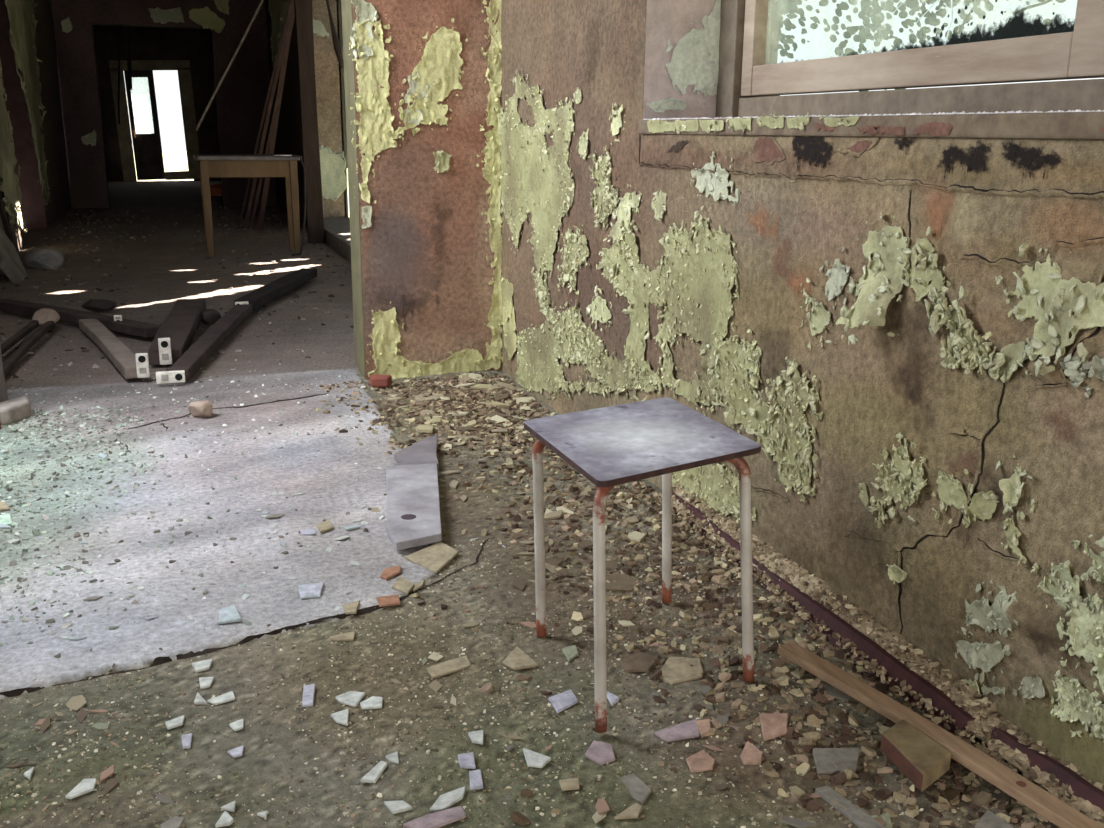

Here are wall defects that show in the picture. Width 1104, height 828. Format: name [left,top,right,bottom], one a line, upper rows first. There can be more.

peeling [319,0,468,229]
peeling [366,0,823,502]
peeling [646,0,953,165]
mould [792,136,833,172]
crack [638,129,1104,237]
damp [894,138,916,157]
peeling [800,213,1104,398]
mould [937,140,1060,179]
crack [959,237,1104,286]
crack [1035,326,1101,389]
crack [843,382,1028,634]
peeling [859,432,1104,742]